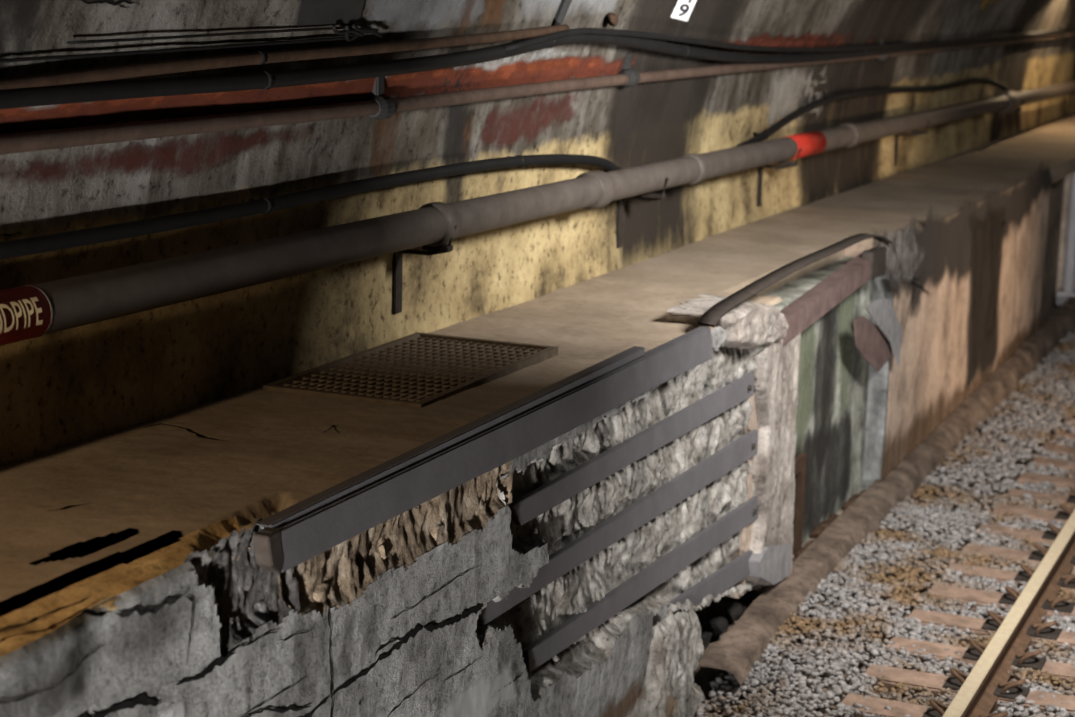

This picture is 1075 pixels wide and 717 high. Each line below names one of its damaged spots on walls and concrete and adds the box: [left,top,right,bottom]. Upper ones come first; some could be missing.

crack [0,595,316,717]
crack [242,565,483,717]
spalling [0,339,765,658]
spalling [475,456,761,702]